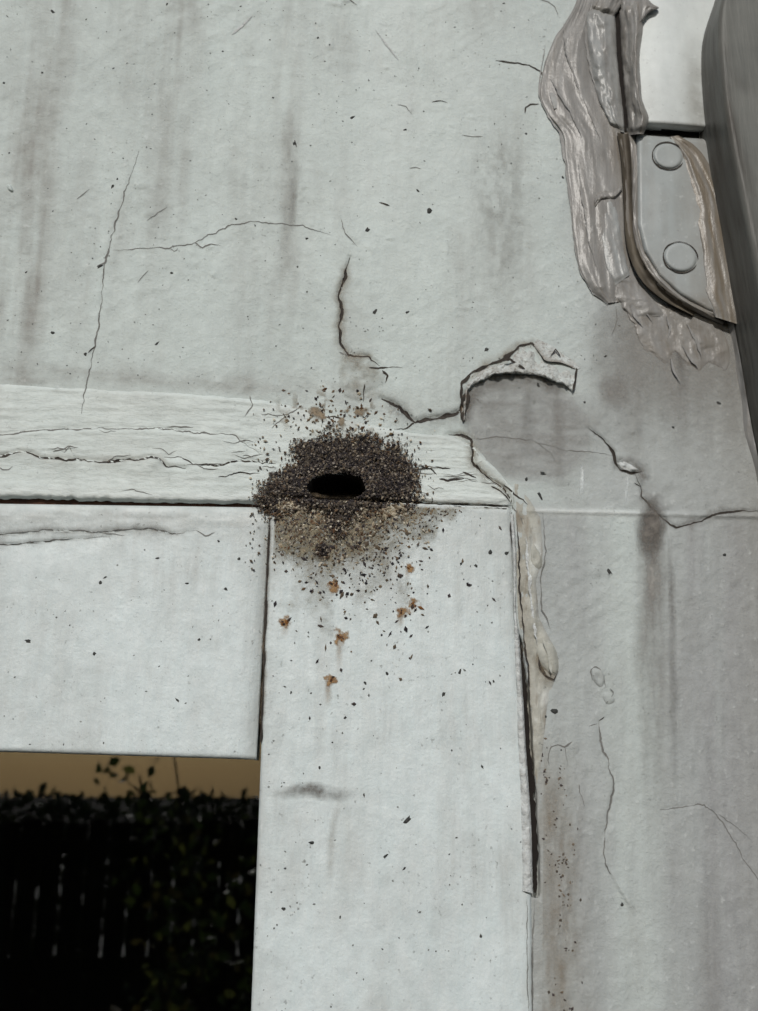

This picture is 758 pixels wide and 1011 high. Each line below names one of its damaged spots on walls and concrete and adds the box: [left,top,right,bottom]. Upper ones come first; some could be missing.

peeling [459,339,580,422]
crack [0,151,611,705]
spalling [271,473,406,521]
crack [635,477,752,528]
crack [547,742,572,763]
crack [590,717,615,874]